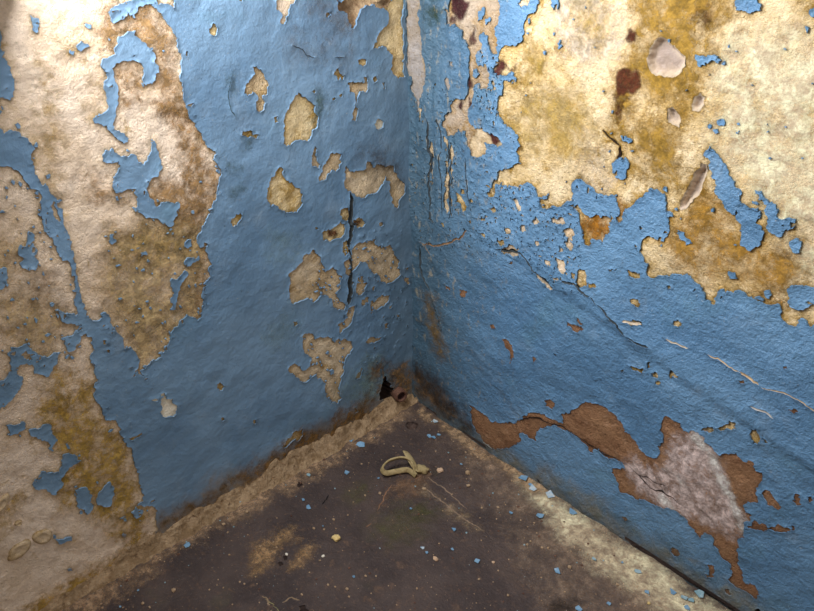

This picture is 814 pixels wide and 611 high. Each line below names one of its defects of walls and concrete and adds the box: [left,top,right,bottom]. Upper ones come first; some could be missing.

peeling [0,0,221,611]
peeling [267,167,303,213]
peeling [288,208,410,403]
crack [347,192,357,305]
peeling [274,90,434,208]
peeling [436,0,814,327]
peeling [469,399,795,599]
efflorescence [623,432,744,540]